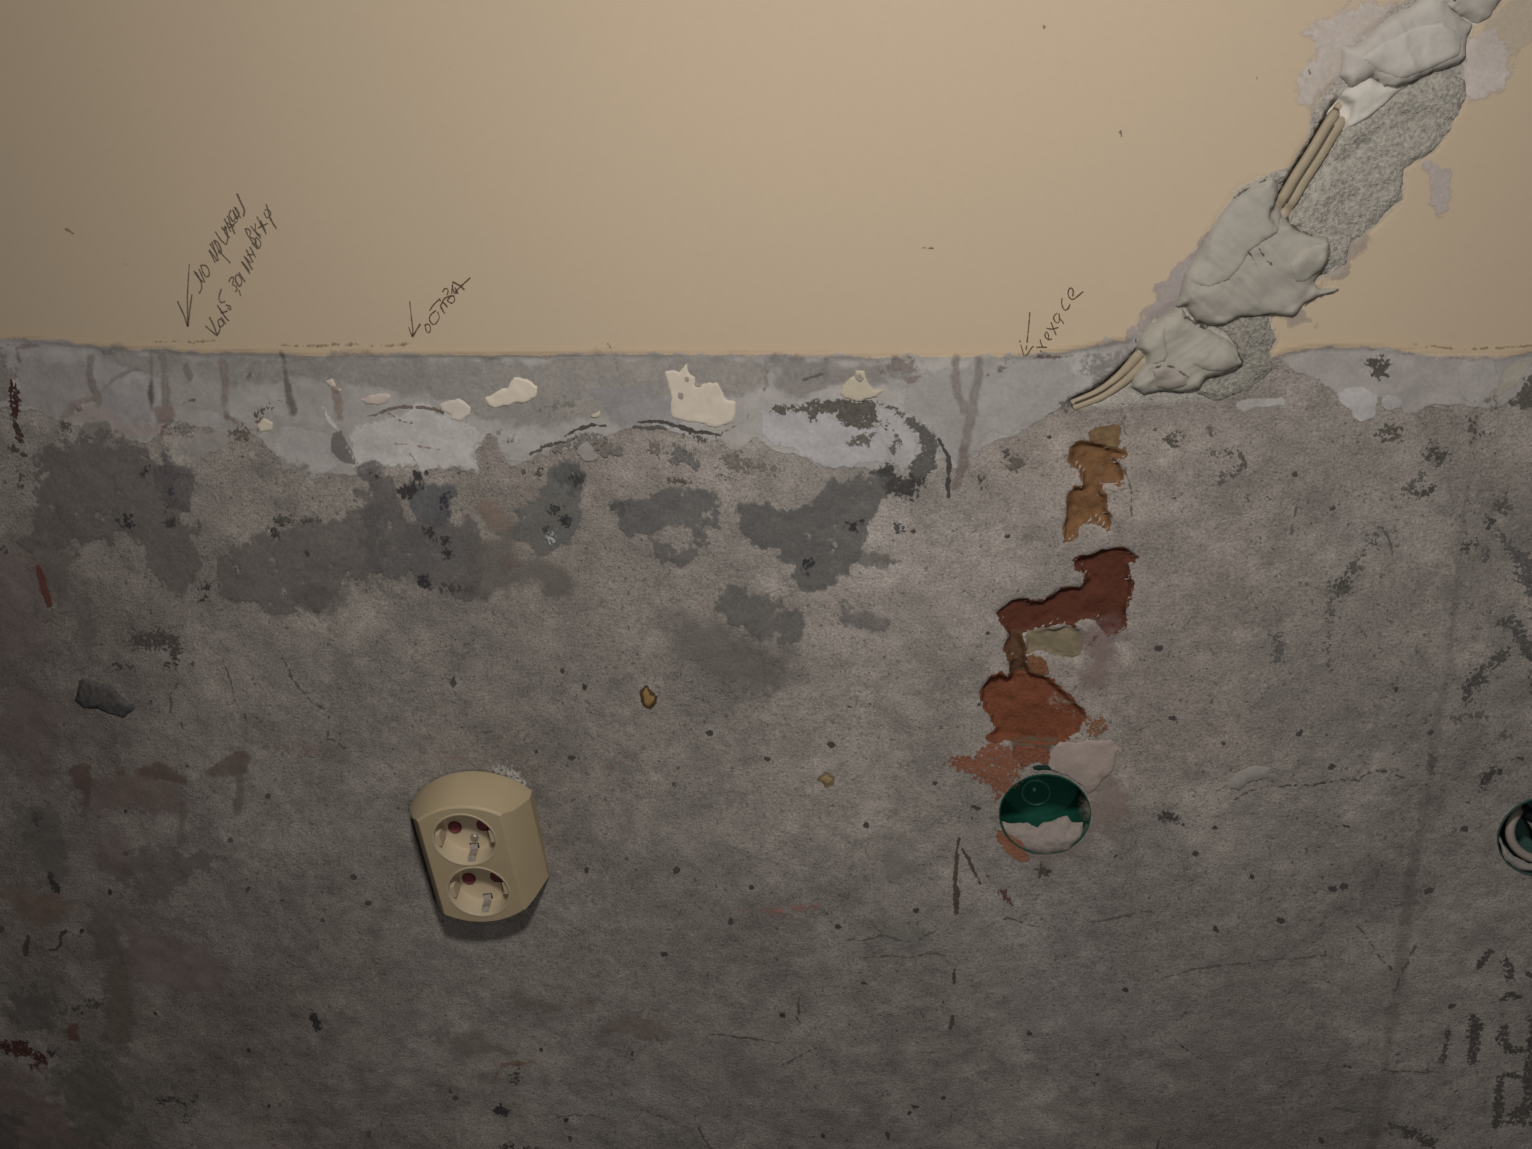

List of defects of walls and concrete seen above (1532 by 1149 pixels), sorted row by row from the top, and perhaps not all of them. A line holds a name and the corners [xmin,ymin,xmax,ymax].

peeling [0,337,1128,501]
peeling [1236,397,1286,411]
peeling [1279,345,1532,422]
damp [17,352,586,614]
damp [609,470,900,591]
damp [715,584,805,644]
spalling [942,423,1139,823]
peeling [639,685,658,710]
peeling [817,771,835,788]
spalling [996,829,1052,879]